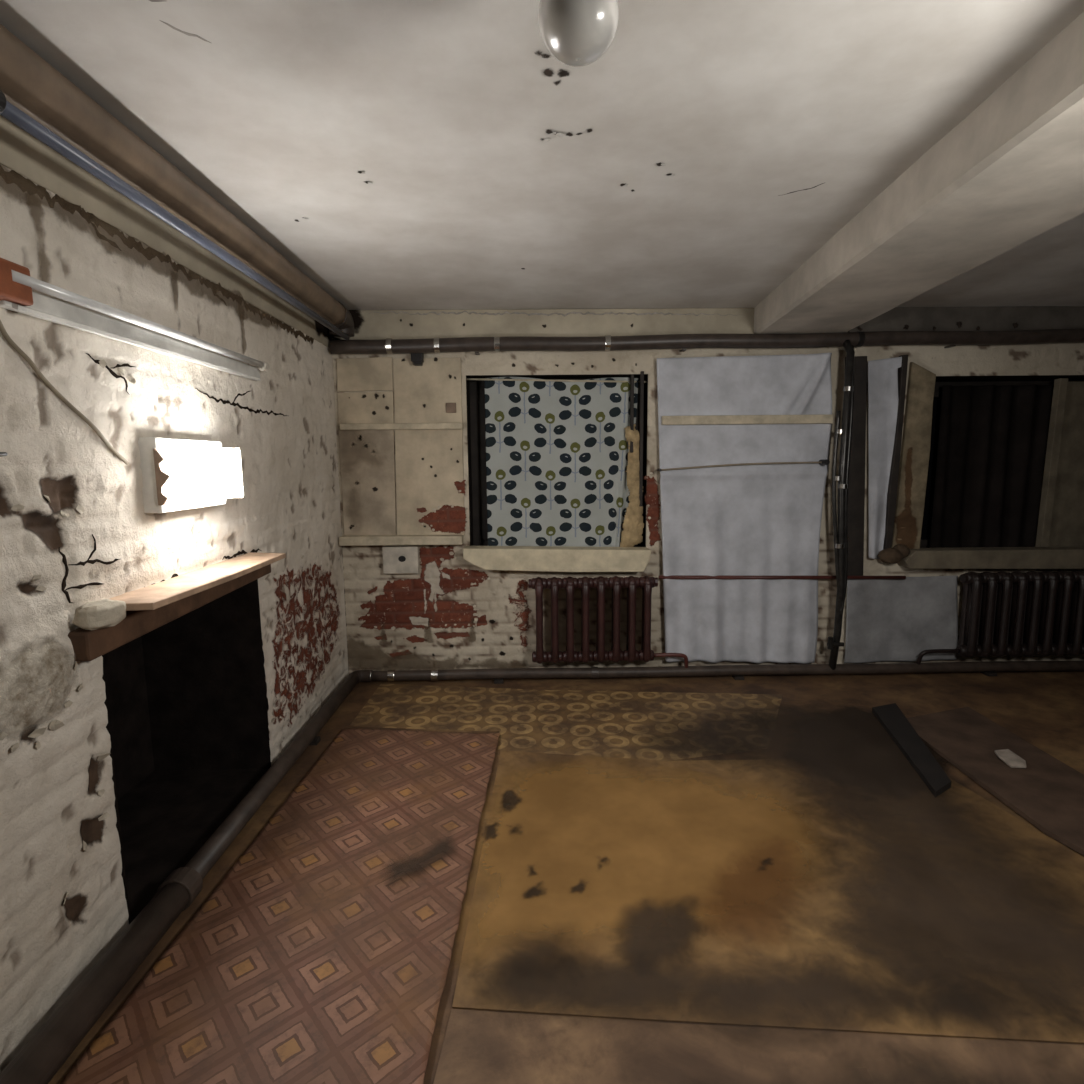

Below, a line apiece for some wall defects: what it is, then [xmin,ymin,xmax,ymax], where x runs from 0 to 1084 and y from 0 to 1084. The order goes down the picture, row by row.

peeling [535,51,569,86]
peeling [541,129,592,143]
crack [4,170,141,244]
crack [167,254,314,344]
crack [86,353,136,395]
crack [195,388,288,416]
peeling [644,470,661,546]
crack [58,534,120,603]
peeling [358,480,496,658]
peeling [267,555,341,728]
peeling [499,575,534,656]